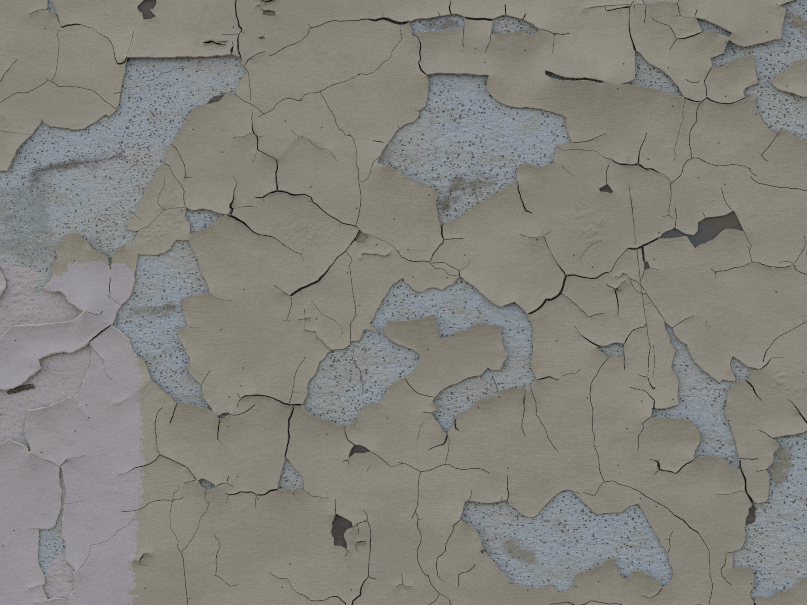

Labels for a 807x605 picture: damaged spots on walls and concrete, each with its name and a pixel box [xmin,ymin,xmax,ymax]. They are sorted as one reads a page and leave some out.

peeling [0,41,249,469]
crack [238,357,306,457]
crack [205,0,470,394]
peeling [291,274,543,440]
crack [449,3,506,46]
peeling [359,8,703,231]
crack [522,69,807,602]
peeling [678,0,807,155]
crack [297,511,376,605]
crack [367,420,509,604]
peeling [443,490,673,598]
peeling [728,421,807,605]